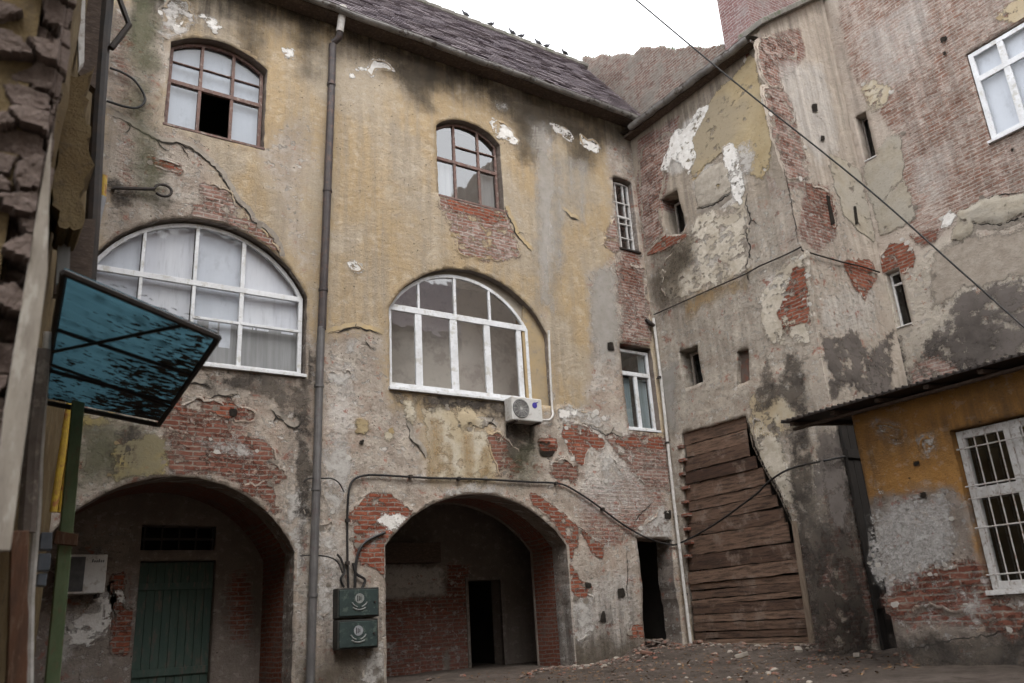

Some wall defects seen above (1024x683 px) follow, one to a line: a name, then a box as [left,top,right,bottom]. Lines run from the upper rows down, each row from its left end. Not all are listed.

crack [113,111,285,257]
peeling [489,104,520,146]
peeling [549,123,602,155]
peeling [602,33,838,351]
water stain [820,328,910,399]
flaking render [843,209,1024,309]
water stain [920,278,1024,371]
flaking render [148,393,308,585]
flaking render [317,417,413,622]
flaking render [529,492,606,644]
flaking render [536,403,671,493]
flaking render [867,492,1024,643]